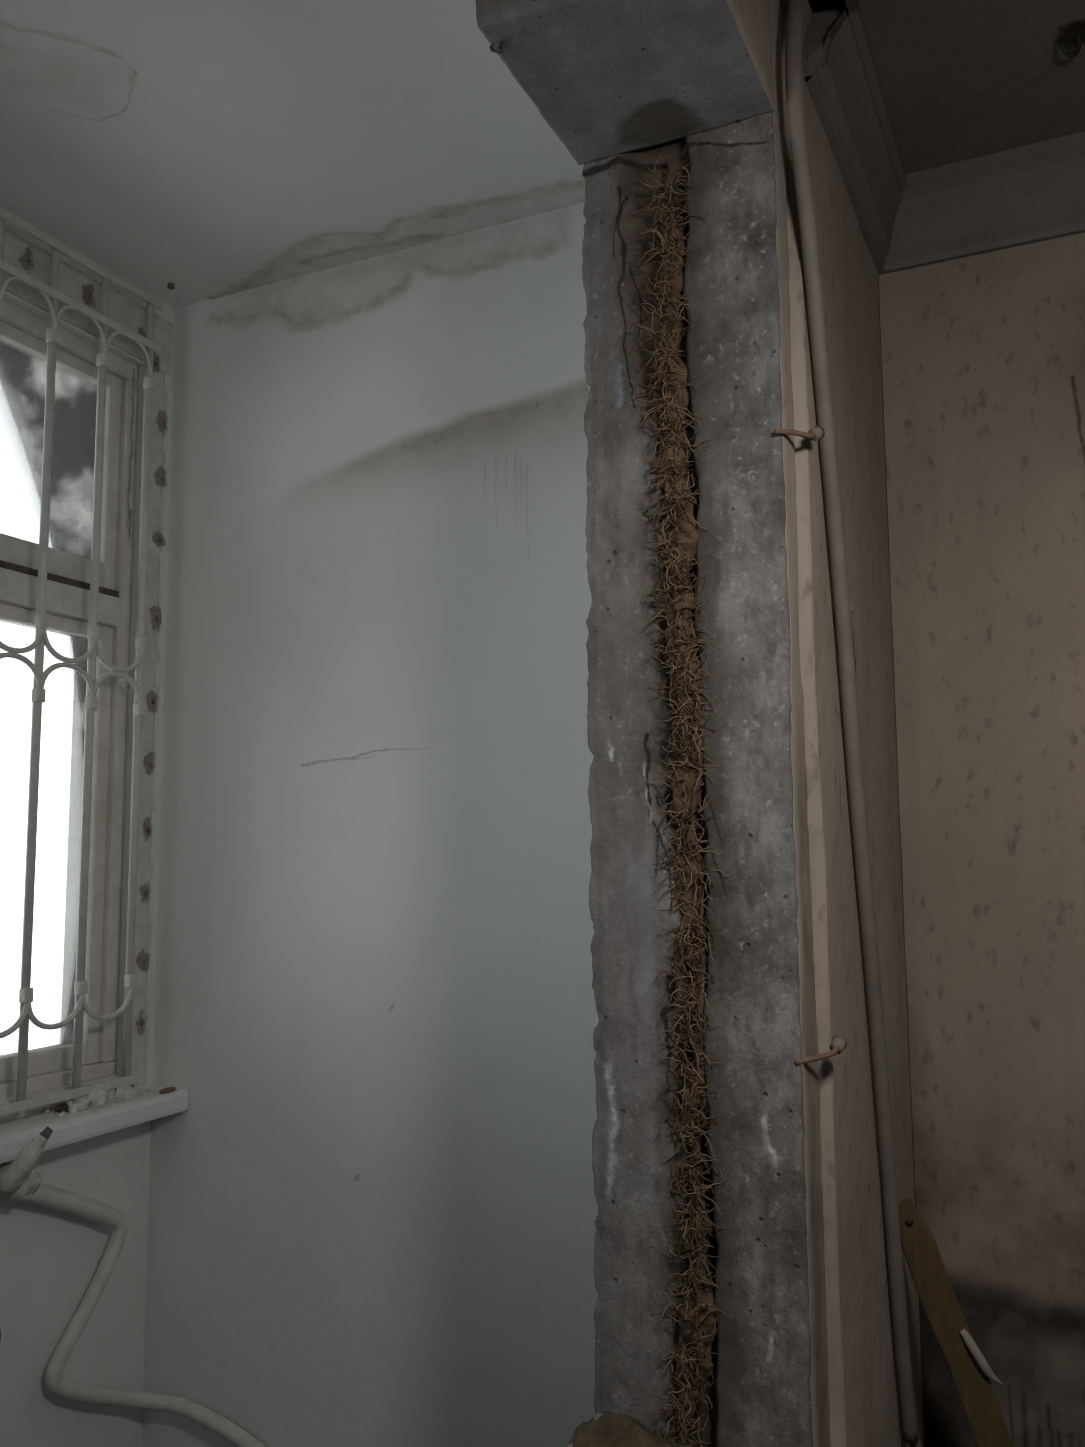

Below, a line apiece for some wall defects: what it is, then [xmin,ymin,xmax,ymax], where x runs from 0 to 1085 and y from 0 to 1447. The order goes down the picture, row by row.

crack [644,733,672,895]
crack [703,770,727,894]
crack [660,975,675,1090]